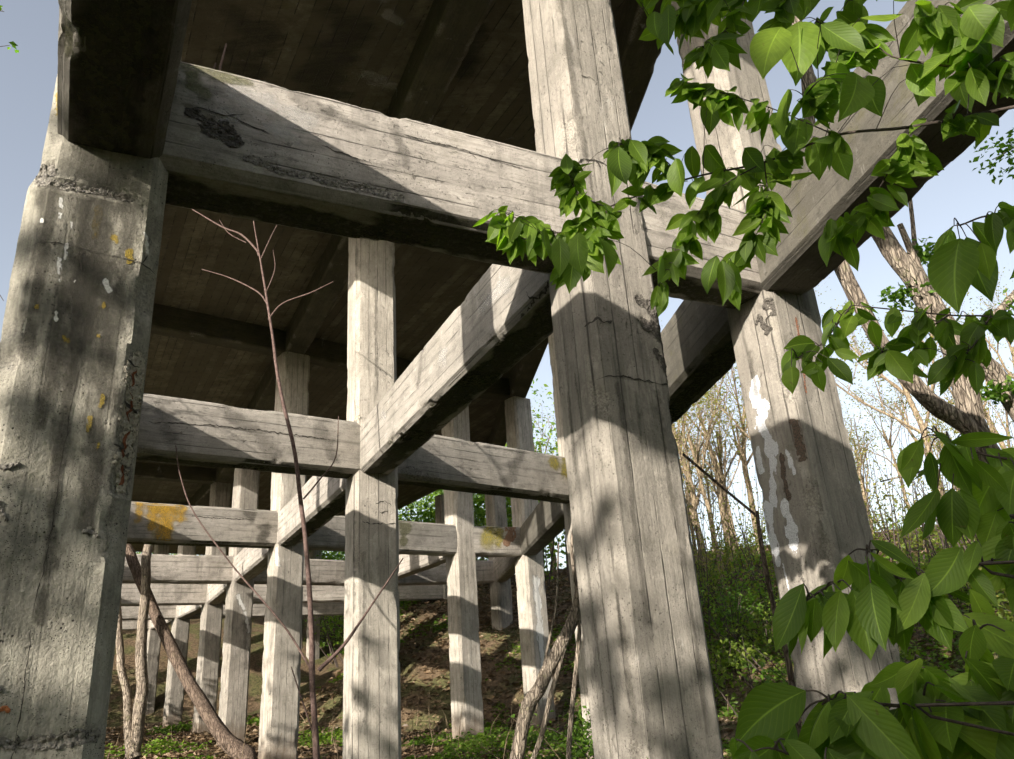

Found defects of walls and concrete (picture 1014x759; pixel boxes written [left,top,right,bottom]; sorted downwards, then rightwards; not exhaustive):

spalling [35,164,133,202]
spalling [184,107,404,202]
water stain [20,0,175,574]
crack [584,316,612,327]
corrosion [119,370,137,485]
spalling [112,347,145,495]
crack [597,375,669,388]
peeling [749,375,807,591]
crack [11,363,82,759]